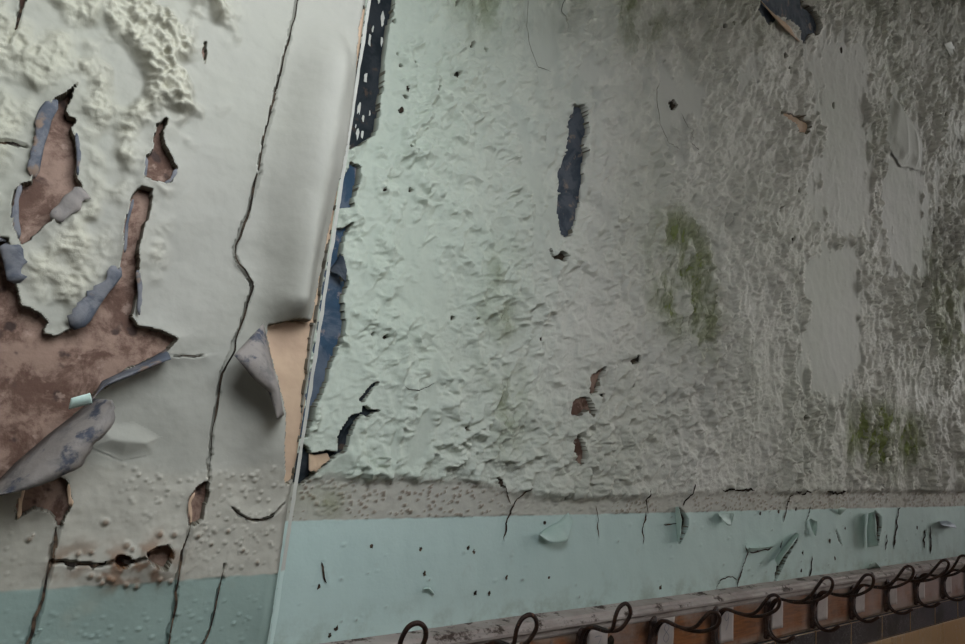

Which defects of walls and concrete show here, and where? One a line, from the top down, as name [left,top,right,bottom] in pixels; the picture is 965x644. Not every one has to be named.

crack [14,7,22,30]
peeling [758,0,816,42]
peeling [557,107,585,237]
peeling [0,96,177,525]
crack [209,0,298,479]
peeling [234,164,378,483]
mould [661,217,718,341]
peeling [571,368,603,415]
mould [849,405,926,470]
crack [233,509,274,521]
crack [26,522,135,644]
crack [168,525,191,644]